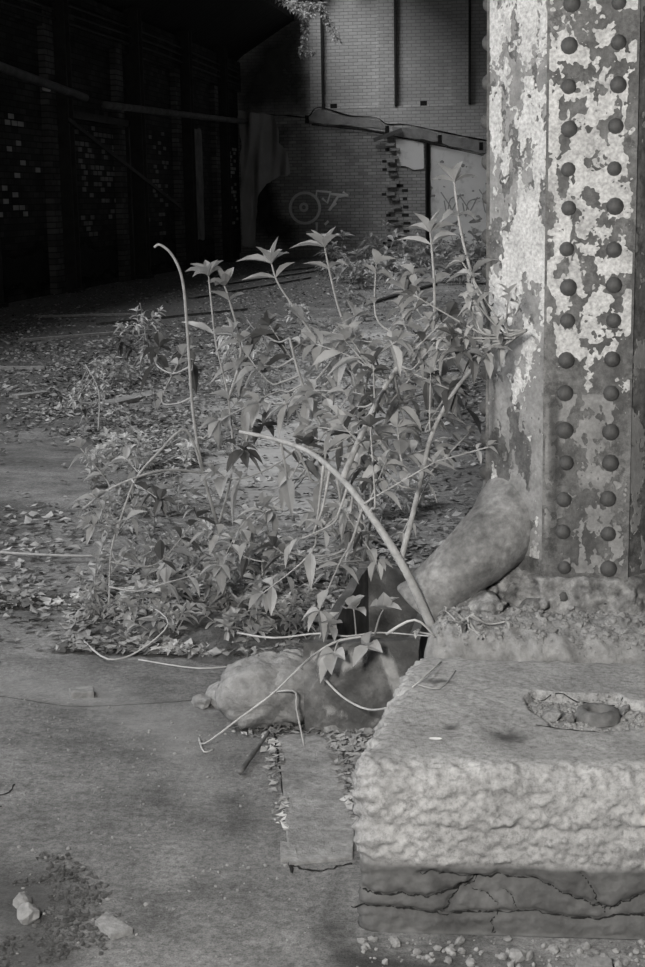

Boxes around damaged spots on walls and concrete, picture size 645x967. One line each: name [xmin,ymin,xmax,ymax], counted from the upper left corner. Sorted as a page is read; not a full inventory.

spalling [382,135,411,251]
peeling [430,0,645,573]
crack [274,733,285,811]
crack [288,861,352,873]
crack [351,870,645,933]